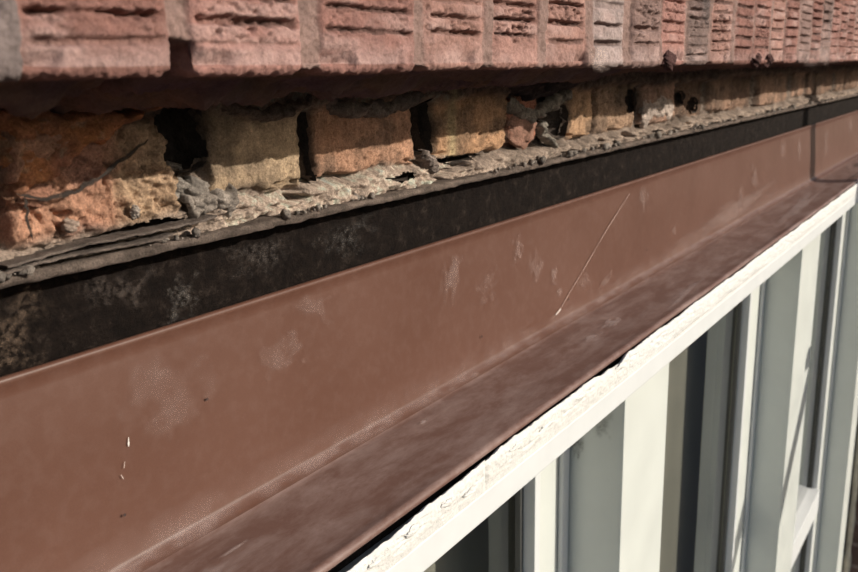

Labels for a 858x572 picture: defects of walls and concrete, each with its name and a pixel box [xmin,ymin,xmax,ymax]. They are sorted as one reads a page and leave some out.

spalling [505,115,537,150]
spalling [0,107,163,210]
crack [18,139,148,240]
peeling [385,171,413,181]
peeling [437,153,481,165]
peeling [61,204,185,247]